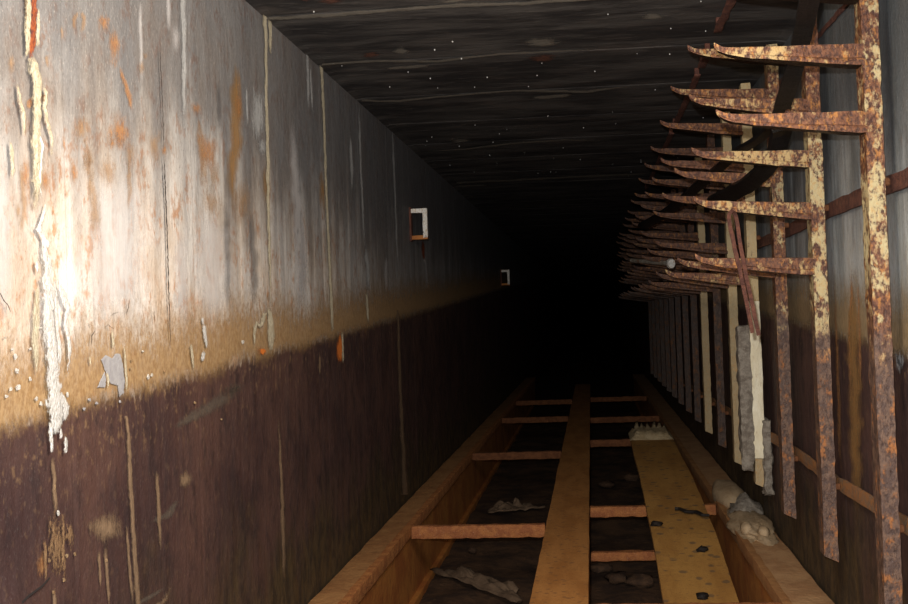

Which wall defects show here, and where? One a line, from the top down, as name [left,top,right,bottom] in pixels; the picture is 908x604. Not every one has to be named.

rust [24,0,40,60]
damp [362,86,631,102]
rust [230,77,241,192]
damp [0,0,589,495]
damp [787,280,811,326]
damp [828,287,868,340]
damp [891,297,908,369]
peeling [89,332,133,403]
damp [628,420,674,441]
damp [89,416,140,604]
damp [156,476,176,544]